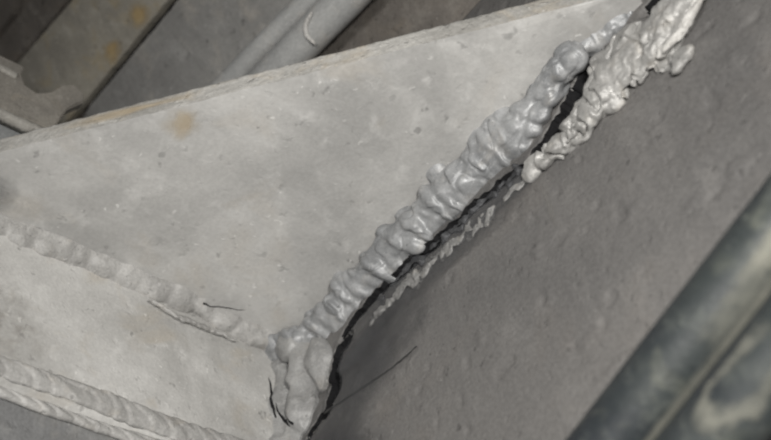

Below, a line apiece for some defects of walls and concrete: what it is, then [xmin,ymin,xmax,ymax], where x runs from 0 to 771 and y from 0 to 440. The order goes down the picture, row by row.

crack [268,49,602,440]